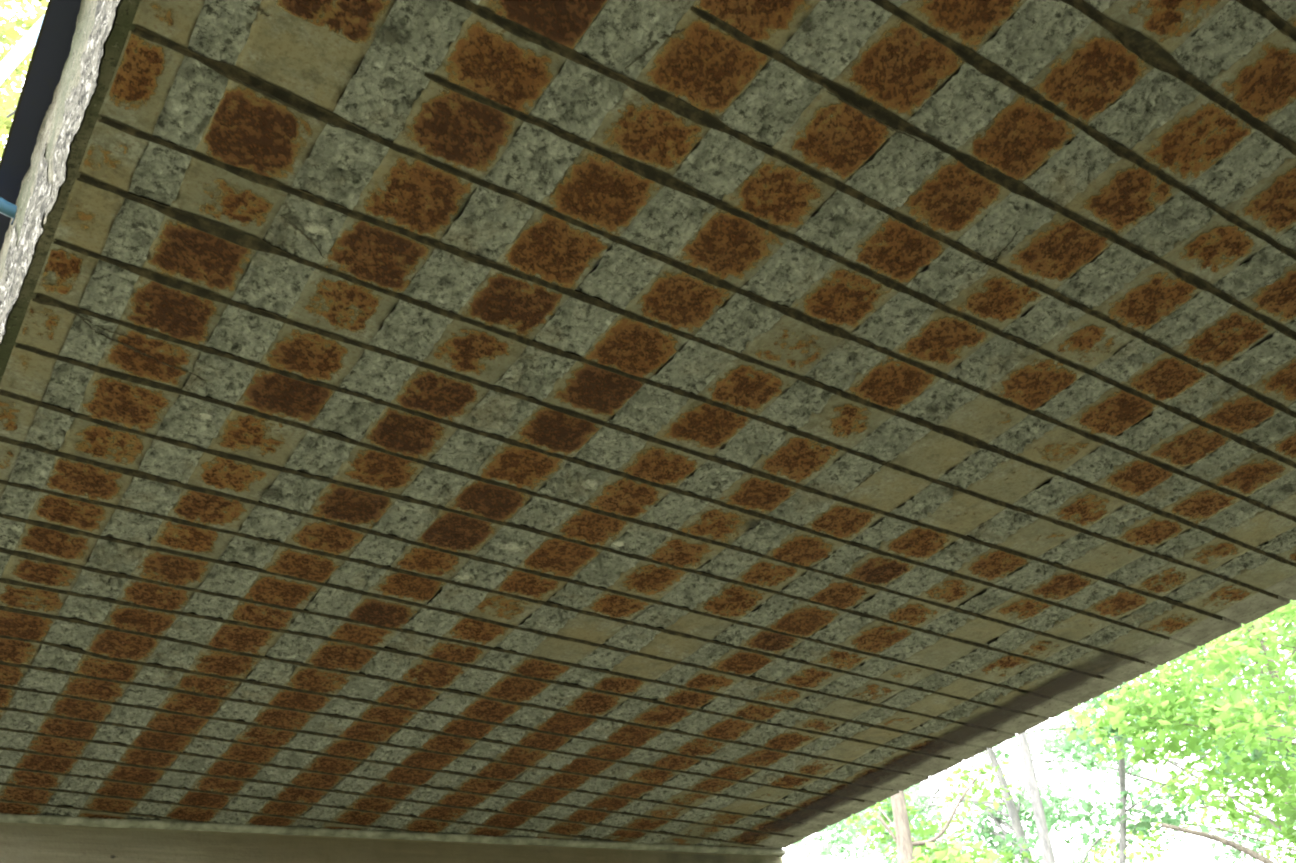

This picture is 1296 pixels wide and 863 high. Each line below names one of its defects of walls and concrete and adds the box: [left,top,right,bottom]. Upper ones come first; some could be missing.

rust [0,0,1028,847]
rust [590,37,1296,626]
rust [982,641,1060,676]
rust [1146,585,1250,634]